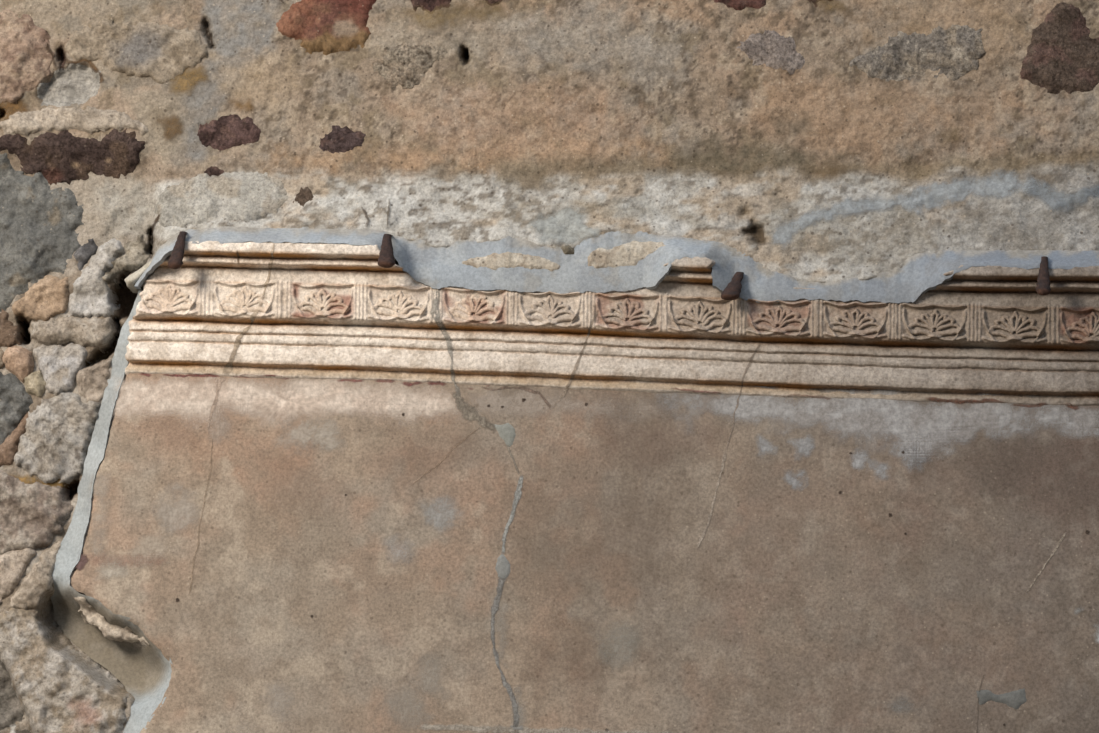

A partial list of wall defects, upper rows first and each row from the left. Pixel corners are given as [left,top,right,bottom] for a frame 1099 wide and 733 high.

damp [639,386,1099,466]
crack [414,292,597,733]
peeling [75,555,88,570]
flaking render [73,597,149,648]